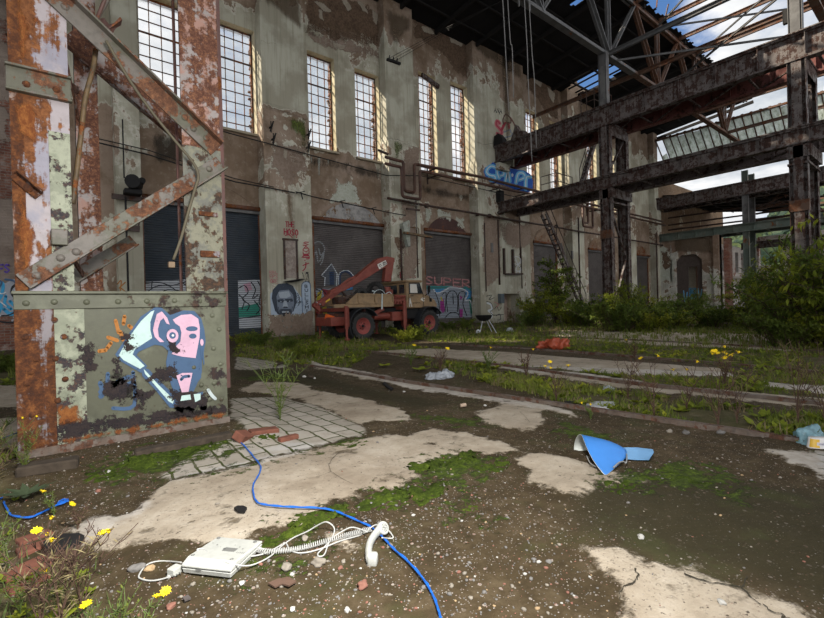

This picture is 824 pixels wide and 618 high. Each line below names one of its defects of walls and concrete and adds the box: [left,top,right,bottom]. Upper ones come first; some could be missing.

corrosion [6,0,22,64]
peeling [306,0,379,58]
flaking render [0,100,12,199]
corrosion [9,91,37,291]
peeling [272,141,308,186]
peeling [57,331,230,441]
crack [684,572,790,618]